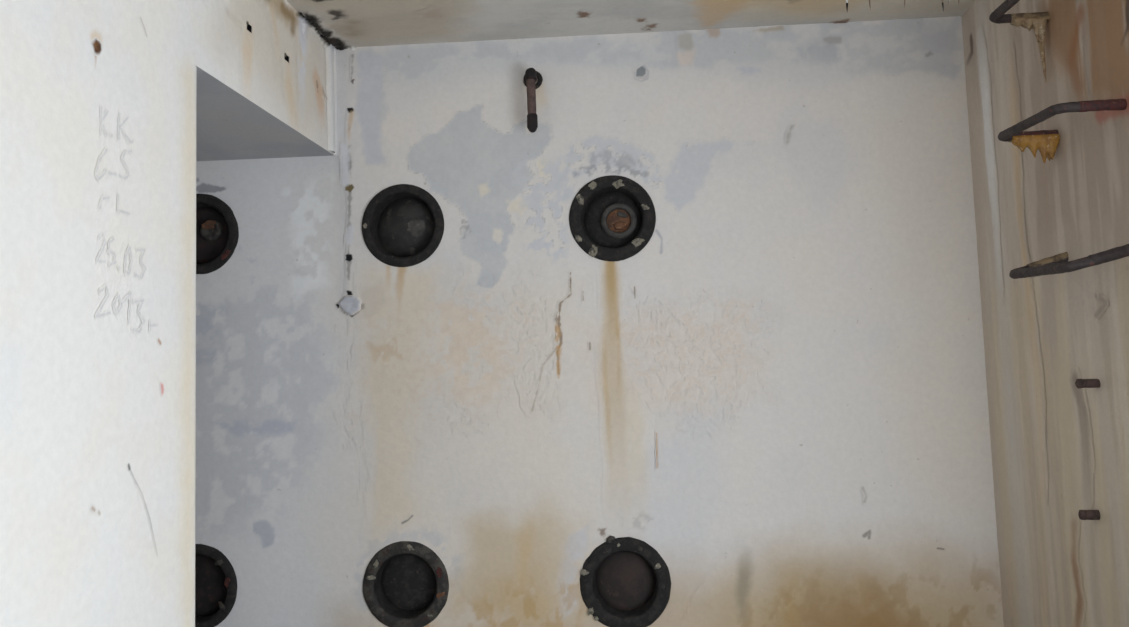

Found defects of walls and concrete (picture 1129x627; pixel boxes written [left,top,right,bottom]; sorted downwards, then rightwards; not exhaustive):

corrosion [87,25,104,71]
peeling [294,0,966,168]
corrosion [679,0,911,30]
peeling [405,102,664,289]
peeling [195,170,392,551]
corrosion [347,252,568,627]
corrosion [424,259,653,627]
crack [530,271,573,413]
leakage [730,542,758,627]
corrosion [648,512,1004,627]